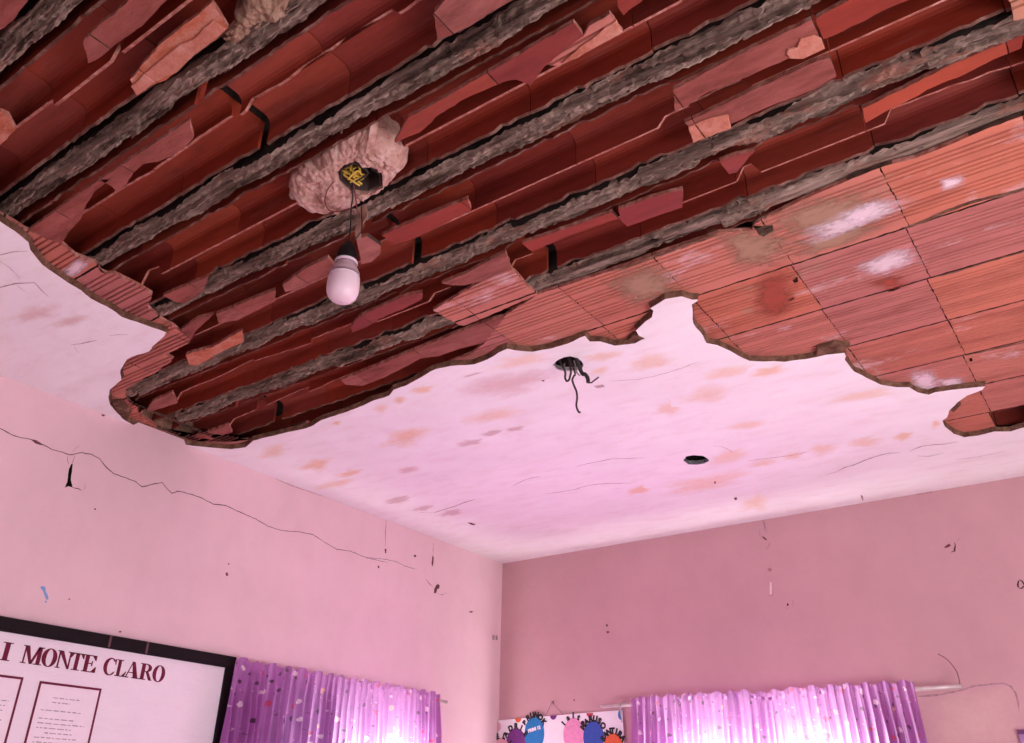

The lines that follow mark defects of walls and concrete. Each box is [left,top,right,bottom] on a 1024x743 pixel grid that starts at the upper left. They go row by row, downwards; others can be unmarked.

peeling [131,19,226,95]
peeling [561,19,622,63]
peeling [786,34,825,59]
peeling [688,114,731,143]
spalling [0,213,168,333]
spalling [108,363,138,425]
spalling [184,290,1024,449]